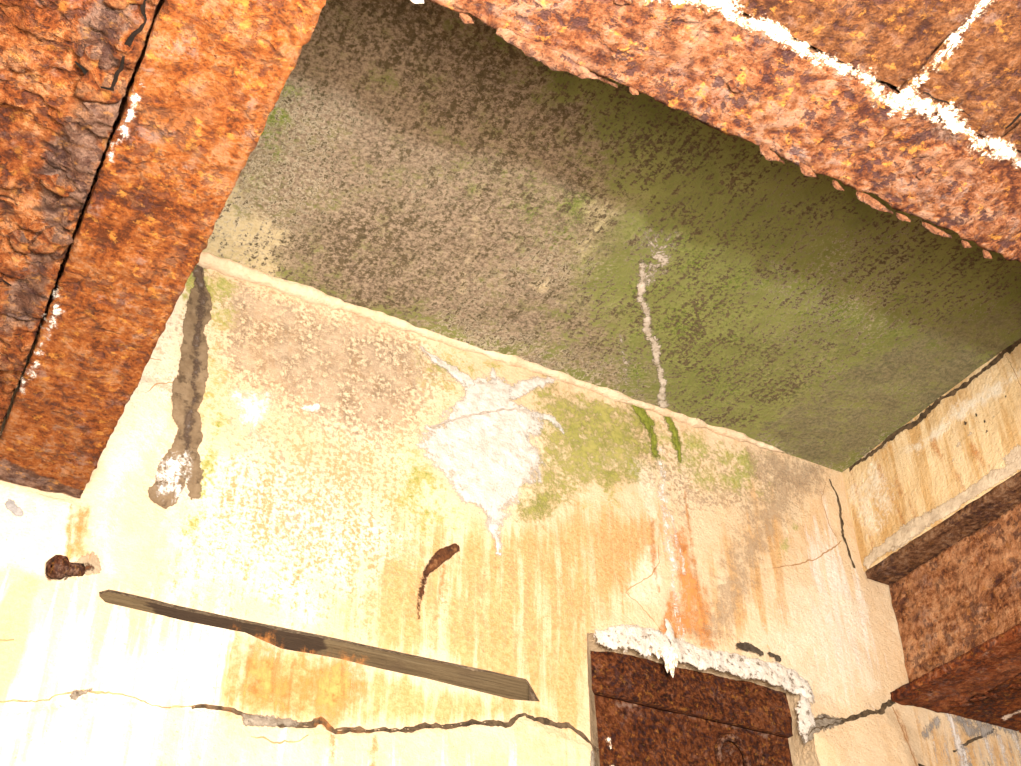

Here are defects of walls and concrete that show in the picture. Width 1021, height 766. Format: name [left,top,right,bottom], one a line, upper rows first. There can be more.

corrosion [459,12,474,24]
corrosion [74,45,126,104]
corrosion [496,27,617,88]
corrosion [760,144,785,164]
corrosion [38,174,76,199]
corrosion [856,191,992,259]
crack [774,338,1021,568]
corrosion [417,543,460,619]
corrosion [661,497,713,647]
leakage [593,448,821,743]
crack [0,688,599,751]
crack [801,699,895,744]